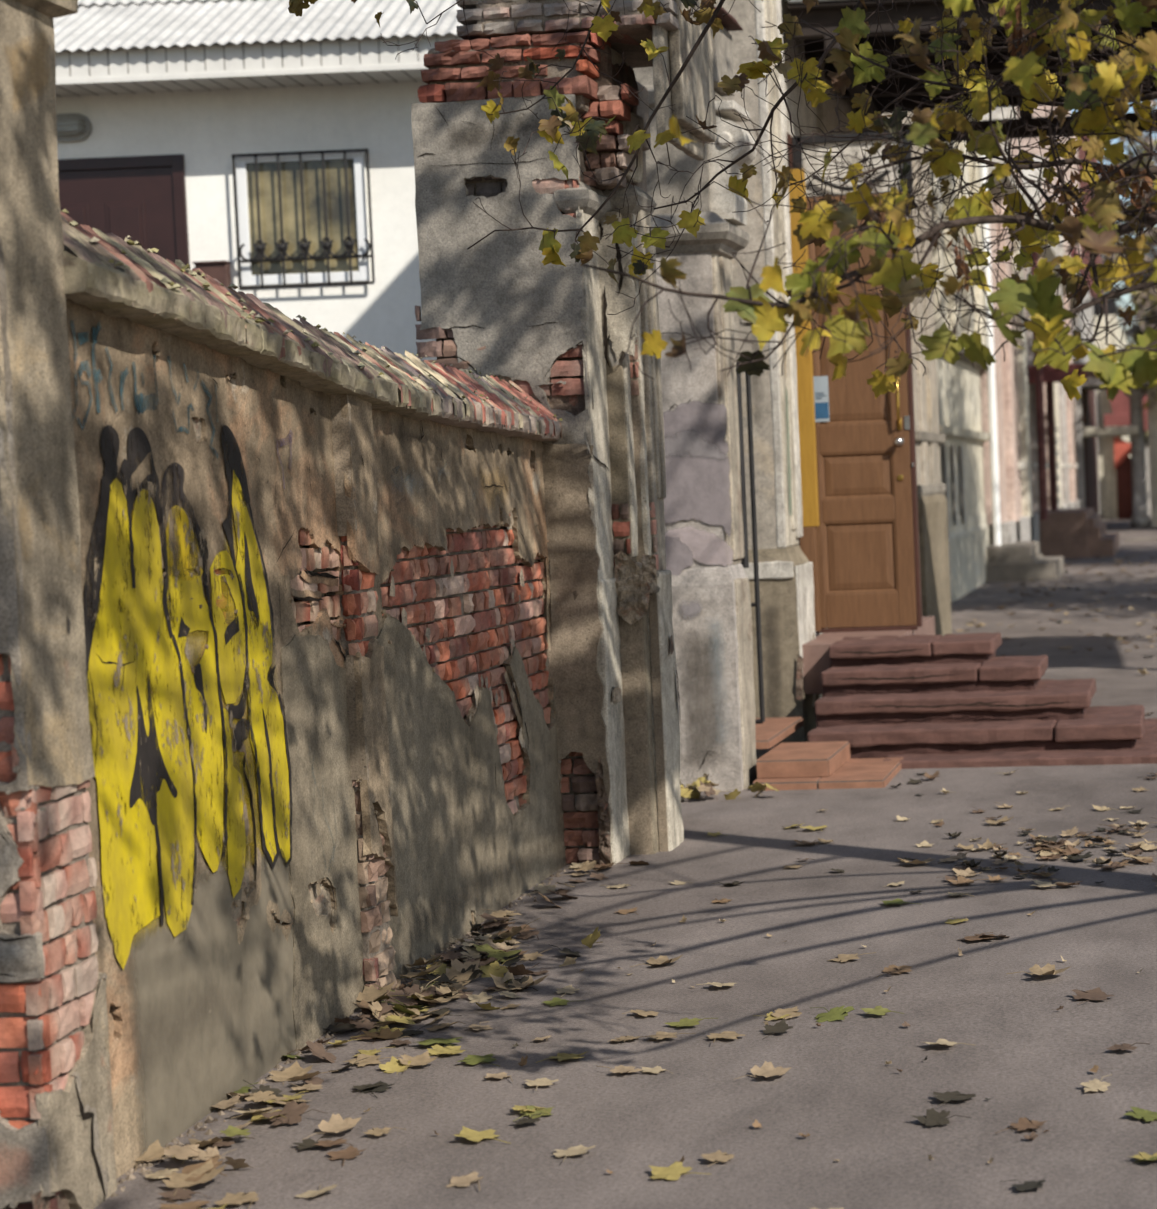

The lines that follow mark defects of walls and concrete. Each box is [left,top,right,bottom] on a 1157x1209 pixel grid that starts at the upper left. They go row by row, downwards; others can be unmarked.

spalling [465,174,508,198]
spalling [532,44,640,218]
spalling [415,305,486,370]
spalling [488,345,594,416]
spalling [611,502,660,625]
spalling [289,508,556,815]
spalling [558,752,611,865]
spalling [0,652,107,1129]
spalling [352,779,397,1004]
crack [75,1074,109,1201]